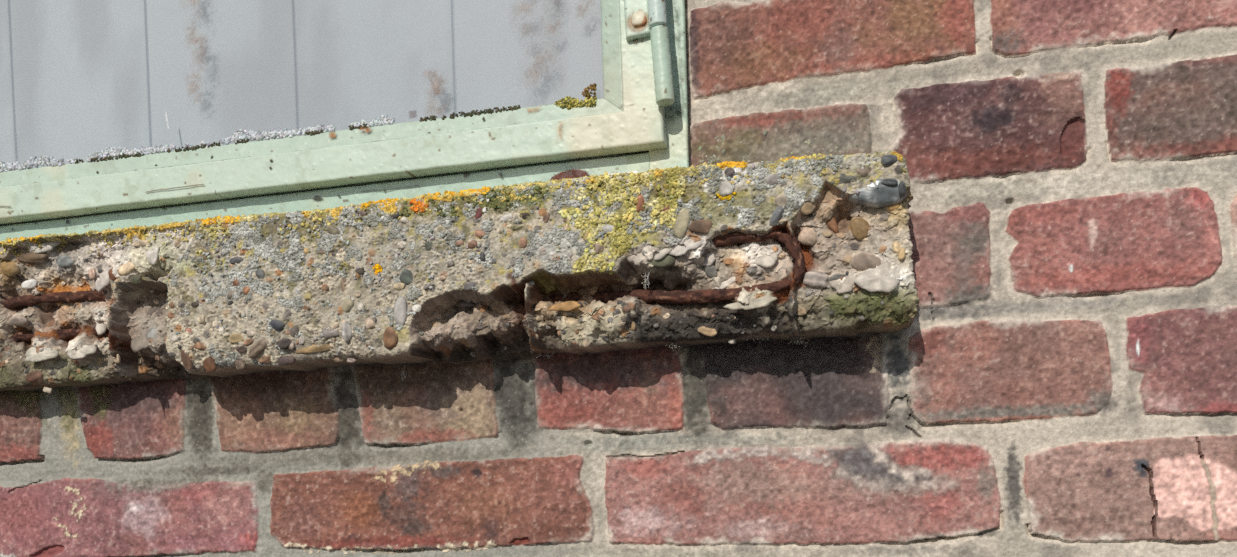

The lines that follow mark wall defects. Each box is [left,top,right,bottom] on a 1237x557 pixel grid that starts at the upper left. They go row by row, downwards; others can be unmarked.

rust [37,284,91,293]
rust [34,315,131,350]
spalling [0,226,208,389]
spalling [408,181,920,373]
water stain [634,305,879,426]
rust [773,225,813,303]
crack [1141,463,1158,538]